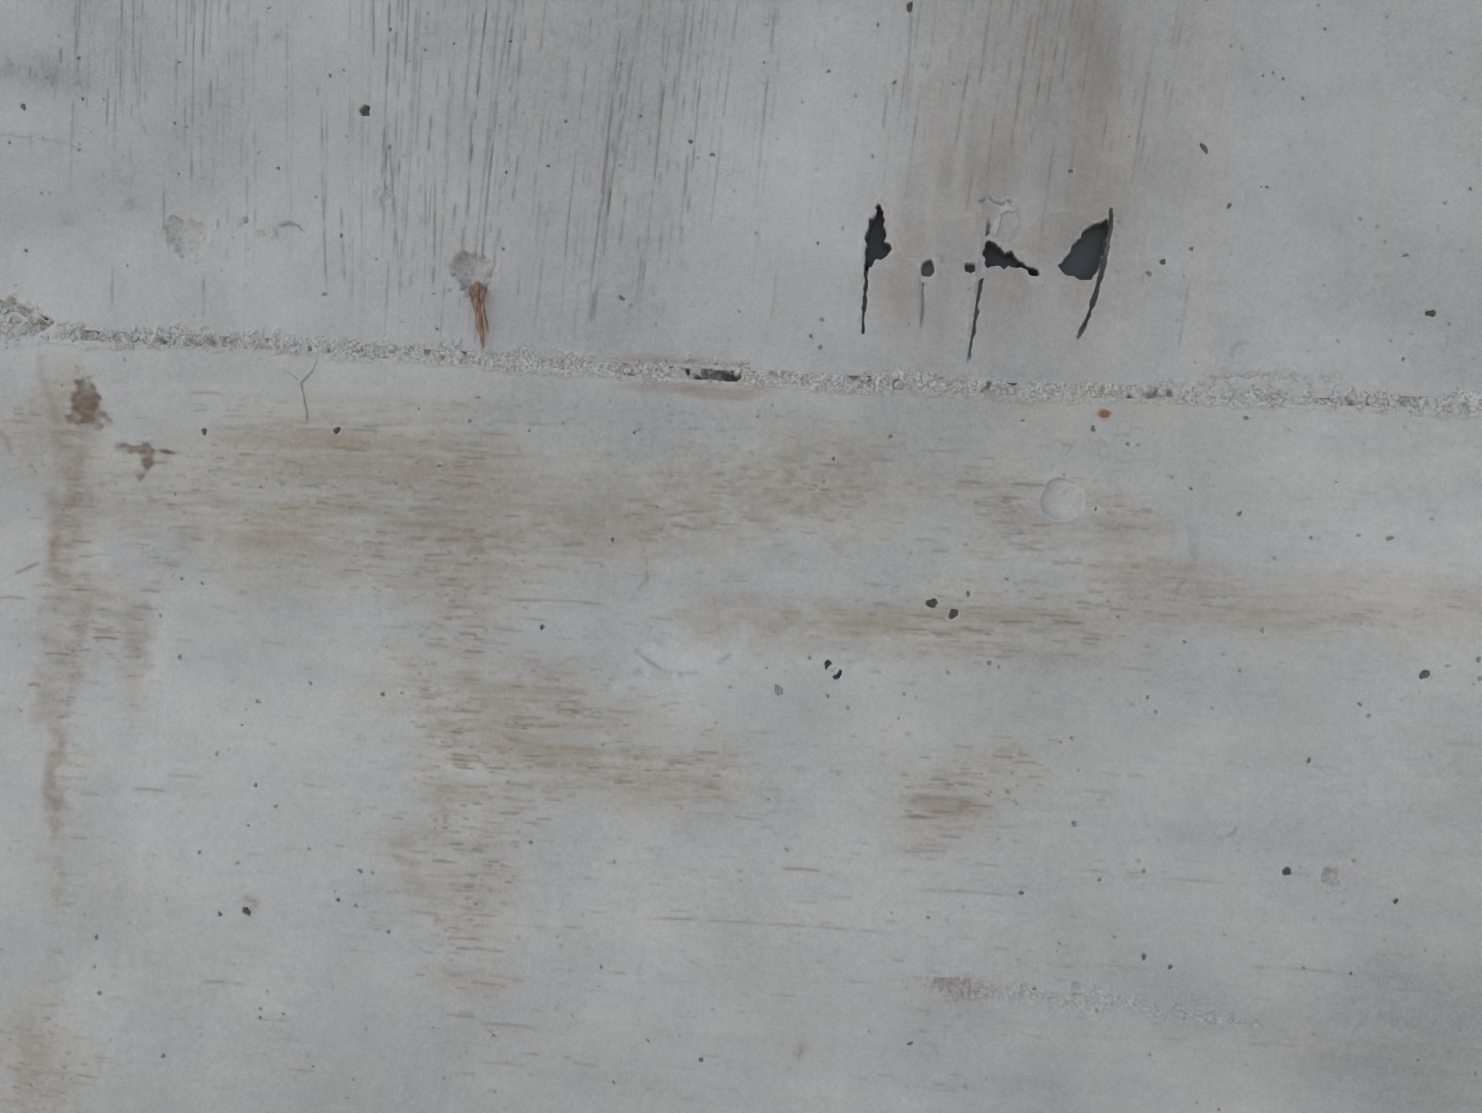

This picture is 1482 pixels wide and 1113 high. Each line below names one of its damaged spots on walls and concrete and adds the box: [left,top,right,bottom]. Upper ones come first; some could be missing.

peeling [863,205,1096,339]
rust [72,380,100,423]